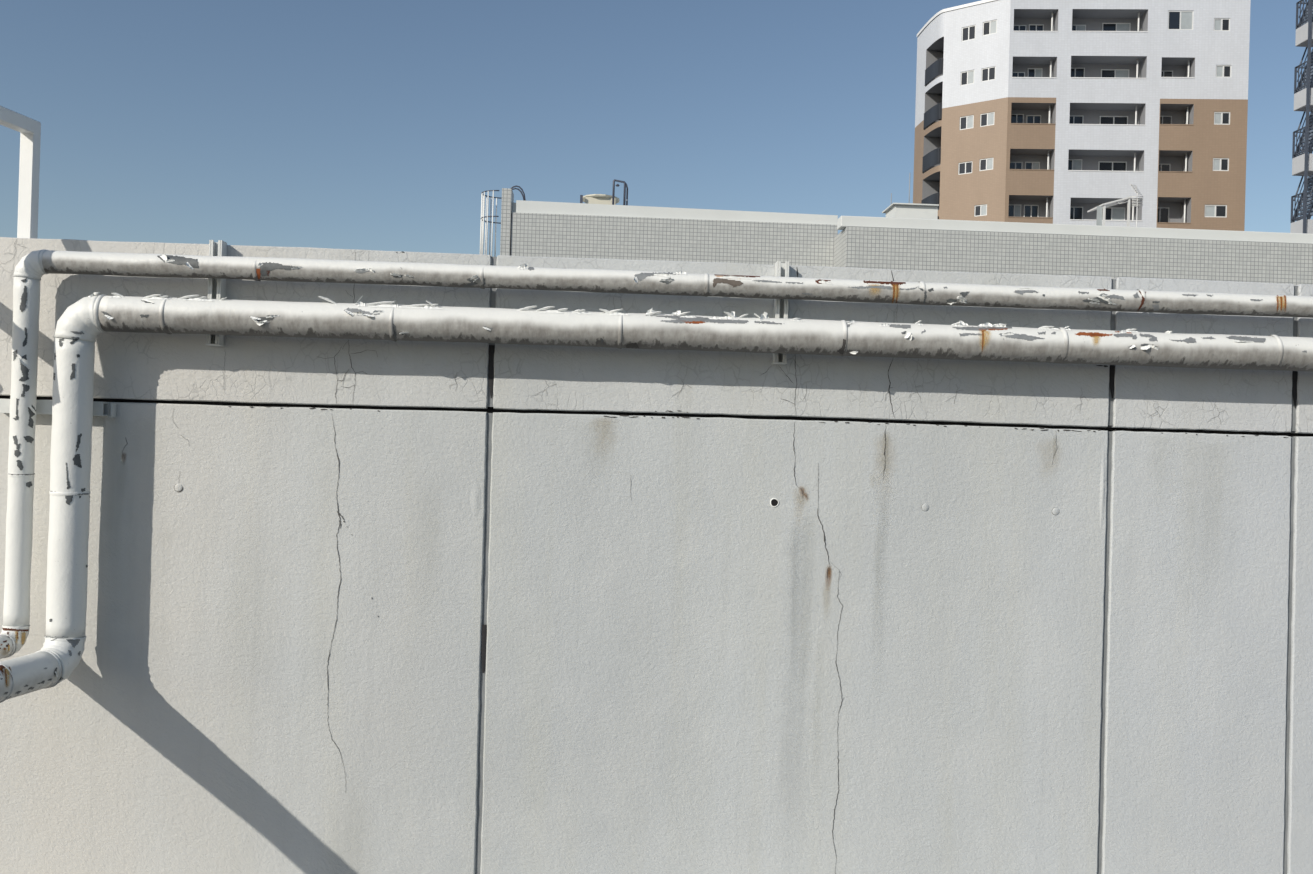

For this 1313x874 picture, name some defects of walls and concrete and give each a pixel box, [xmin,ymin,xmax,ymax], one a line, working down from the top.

crack [320,340,378,792]
crack [761,355,844,868]